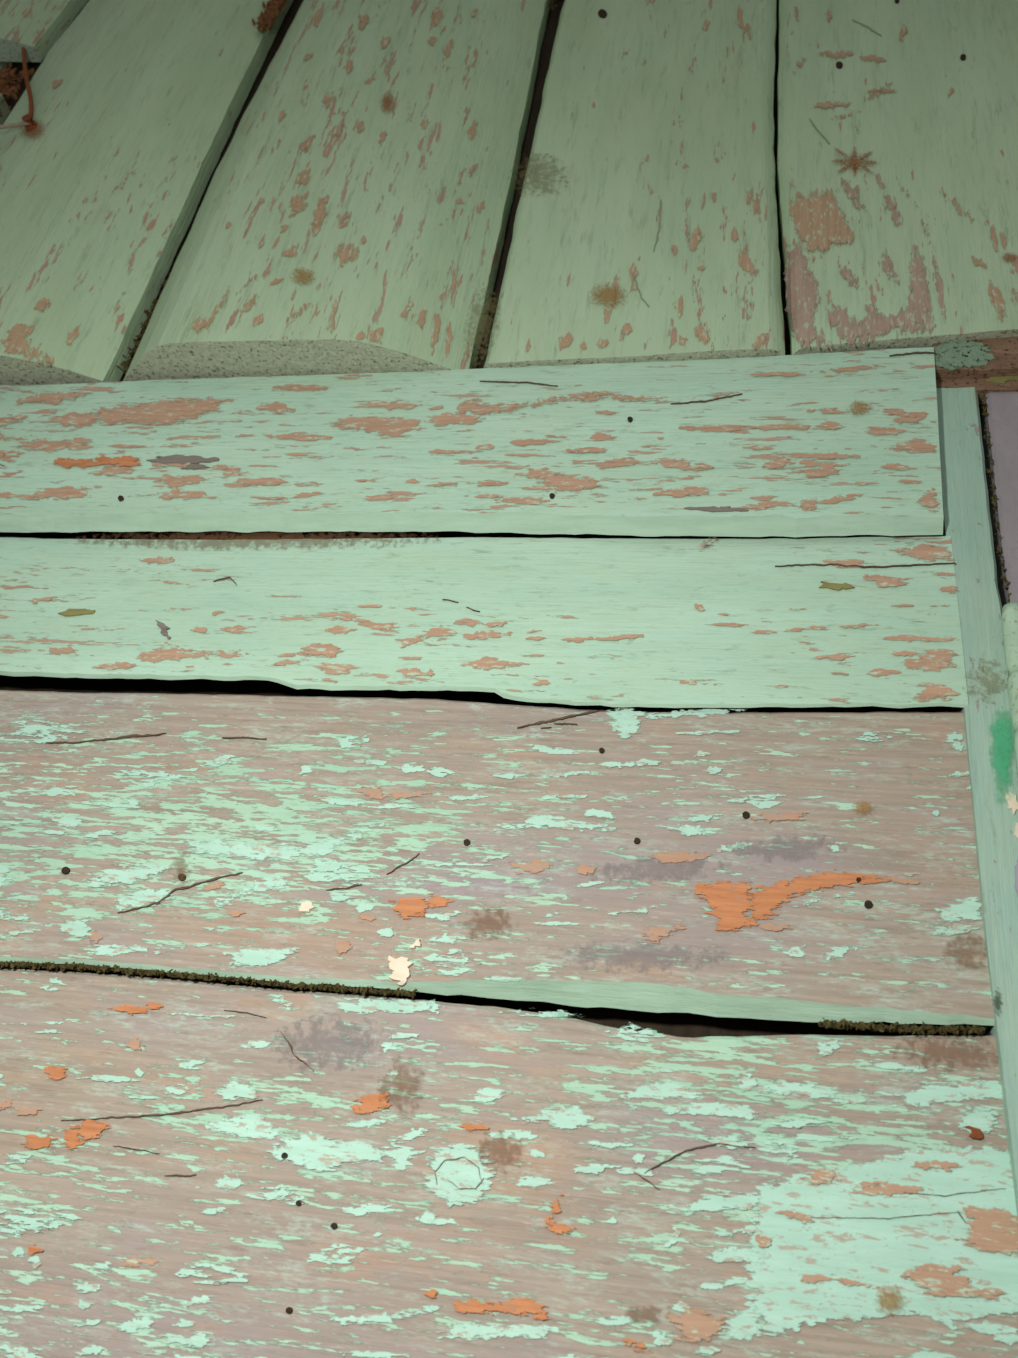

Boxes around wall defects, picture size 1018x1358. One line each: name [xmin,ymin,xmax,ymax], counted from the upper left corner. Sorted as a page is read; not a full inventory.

peeling [0,391,234,463]
peeling [264,390,667,456]
peeling [428,432,713,505]
peeling [274,604,546,682]
peeling [493,758,661,832]
peeling [188,797,416,913]
peeling [59,915,300,968]
peeling [337,997,445,1014]
peeling [497,1009,584,1018]
peeling [598,1022,666,1042]
peeling [205,1079,595,1229]
peeling [616,1061,1018,1356]